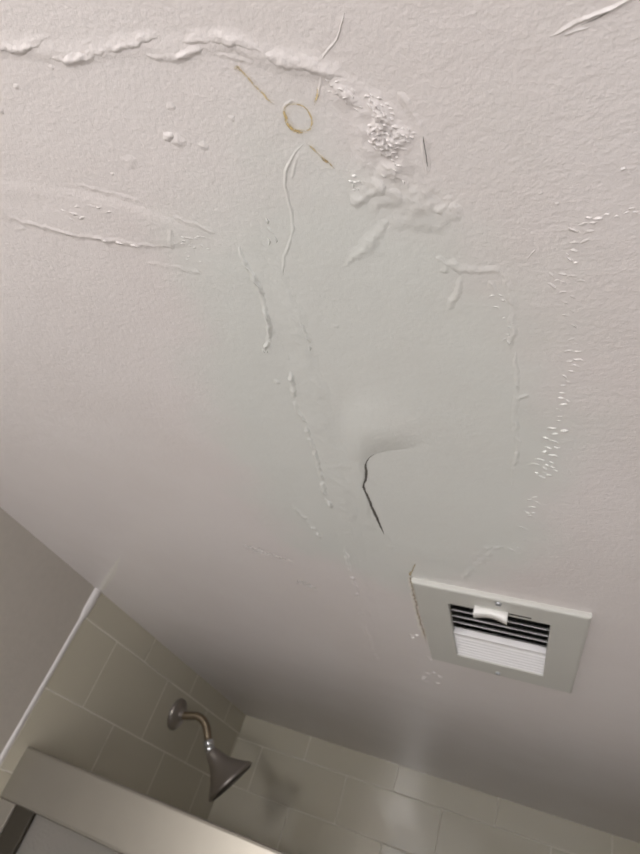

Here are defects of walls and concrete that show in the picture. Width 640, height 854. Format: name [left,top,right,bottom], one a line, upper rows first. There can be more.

crack [362,455,398,548]